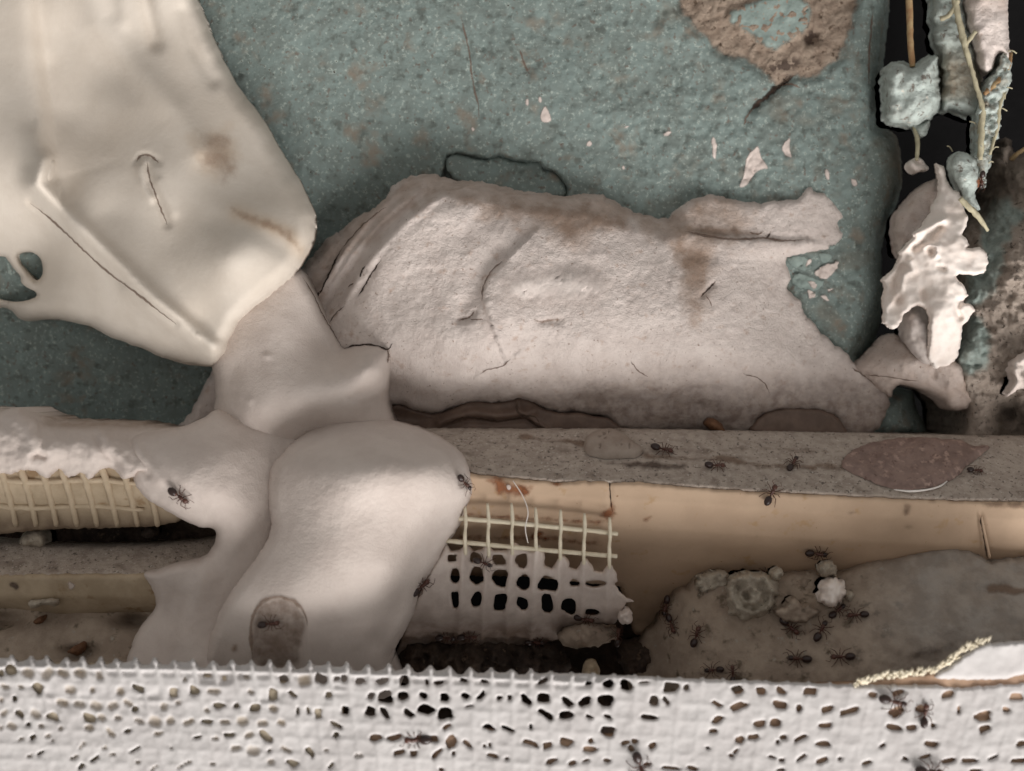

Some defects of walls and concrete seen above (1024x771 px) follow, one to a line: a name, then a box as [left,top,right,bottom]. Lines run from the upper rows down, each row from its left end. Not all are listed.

spalling [680,0,857,86]
crack [137,154,167,224]
peeling [445,154,567,196]
peeling [945,151,980,211]
crack [34,206,177,325]
crack [304,207,392,361]
crack [461,262,501,320]
peeling [788,245,839,301]
flaking render [557,622,617,649]